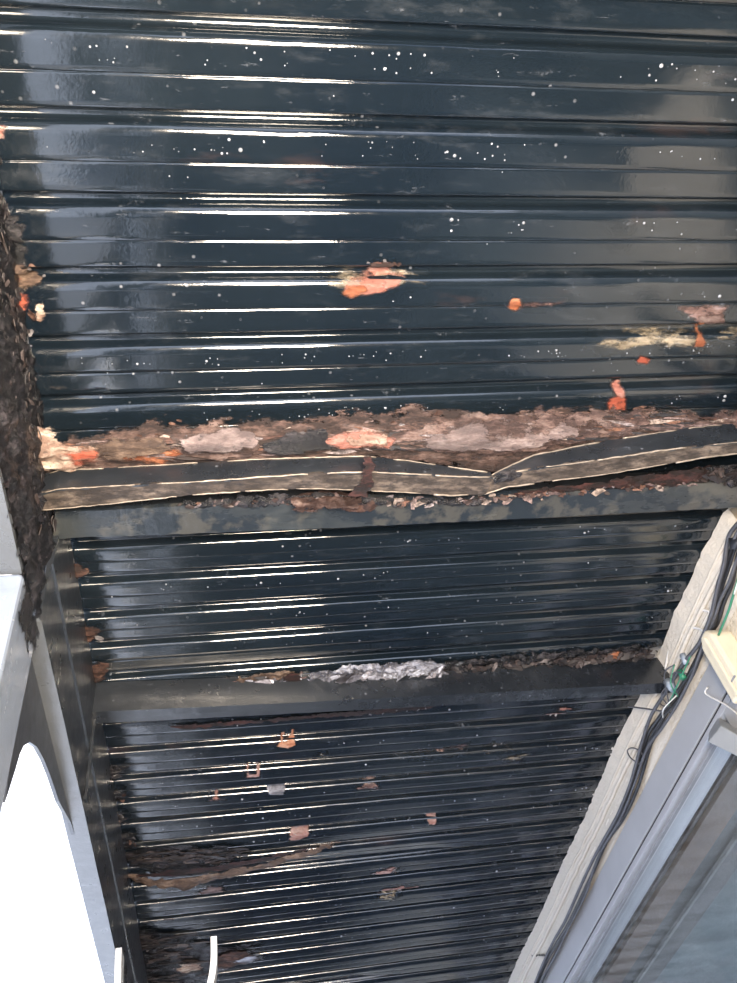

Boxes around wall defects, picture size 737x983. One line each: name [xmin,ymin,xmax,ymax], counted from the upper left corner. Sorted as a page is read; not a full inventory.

rust [329,259,407,298]
rust [508,298,552,310]
rust [608,379,626,410]
peeling [323,647,658,684]
rust [277,729,295,748]